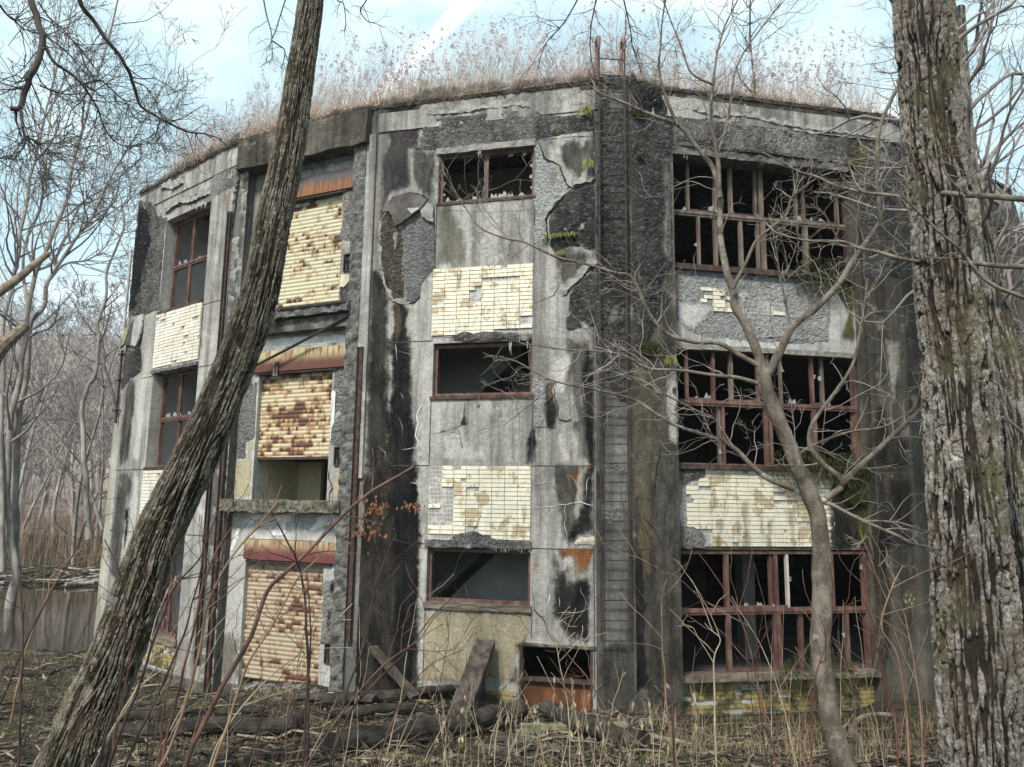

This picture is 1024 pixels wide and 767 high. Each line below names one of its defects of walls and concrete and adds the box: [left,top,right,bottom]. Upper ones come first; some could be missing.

spalling [377,76,901,402]
spalling [118,200,167,389]
water stain [354,271,529,691]
spalling [680,469,706,485]
corrosion [560,548,594,570]
spalling [680,524,705,549]
water stain [554,560,590,642]